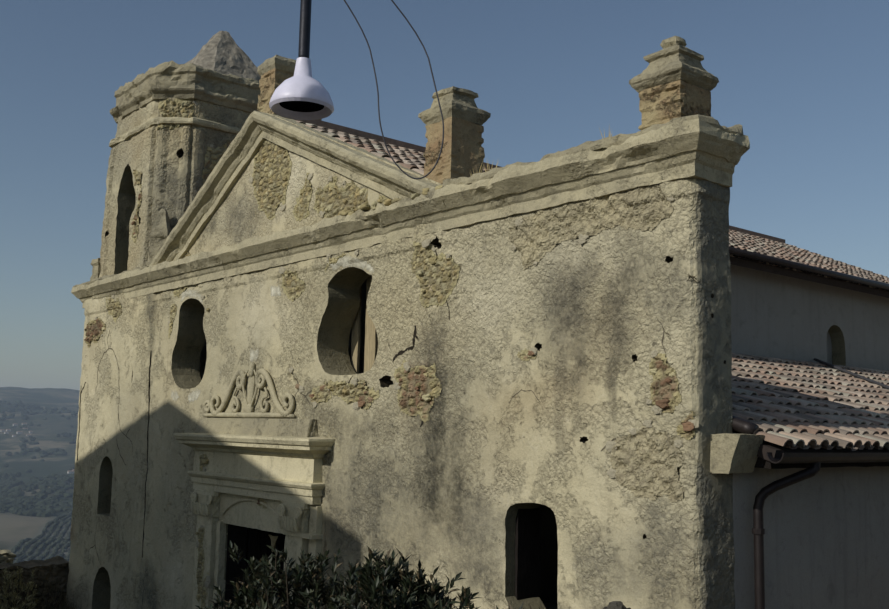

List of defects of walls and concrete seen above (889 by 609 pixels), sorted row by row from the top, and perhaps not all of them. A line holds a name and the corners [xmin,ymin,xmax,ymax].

spalling [156,98,198,130]
spalling [202,139,234,184]
spalling [248,139,389,221]
spalling [279,266,305,301]
spalling [411,236,460,308]
spalling [84,295,122,349]
crack [393,325,418,361]
spalling [295,359,442,423]
spalling [606,350,699,502]
crack [77,330,152,604]